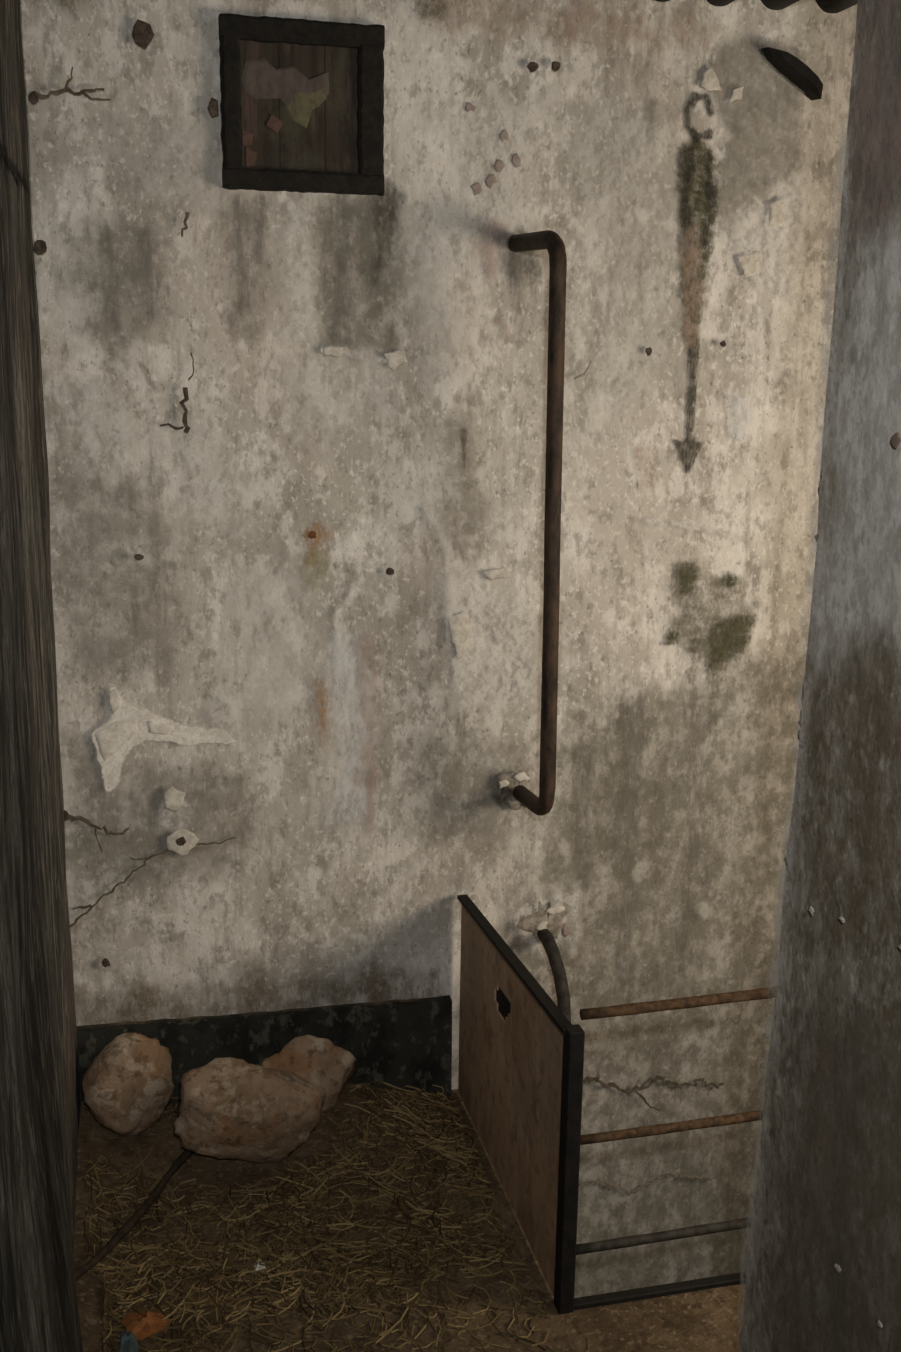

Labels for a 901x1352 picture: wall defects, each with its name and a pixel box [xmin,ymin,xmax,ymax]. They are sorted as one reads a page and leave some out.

crack [28,67,111,104]
crack [64,810,236,927]
leakage [506,562,804,1295]
crack [583,1075,724,1111]